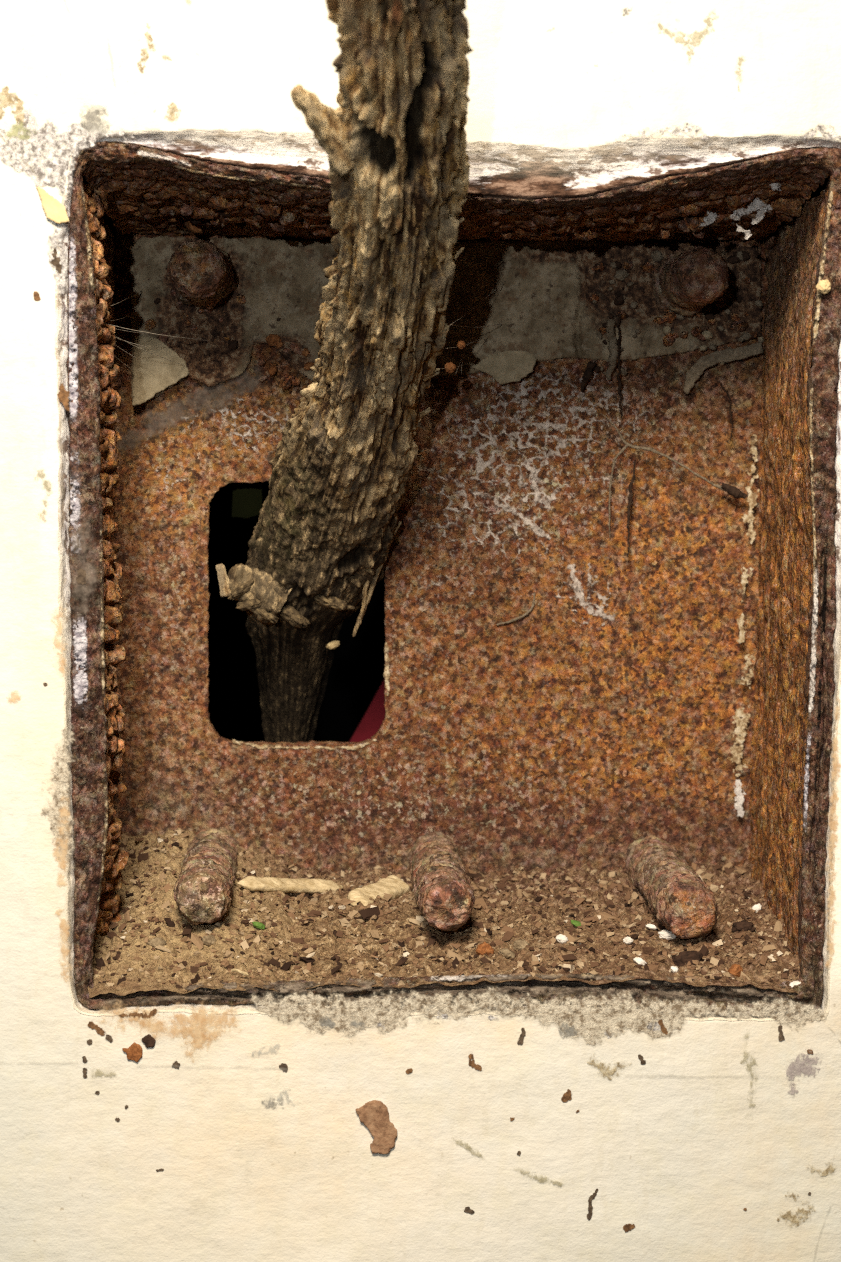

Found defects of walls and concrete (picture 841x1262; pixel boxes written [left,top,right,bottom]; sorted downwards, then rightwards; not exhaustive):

spalling [0,86,255,421]
corrosion [169,203,311,234]
corrosion [485,215,705,338]
corrosion [653,251,751,346]
peeling [70,452,82,555]
peeling [72,577,105,704]
peeling [98,768,108,900]
corrosion [826,707,841,966]